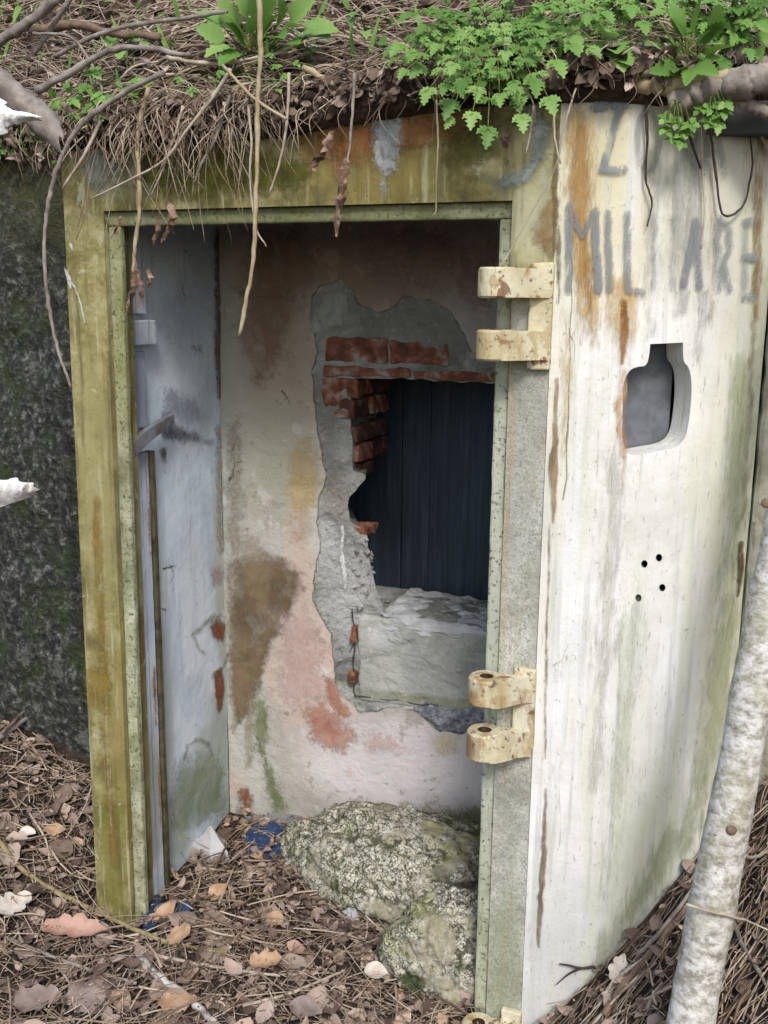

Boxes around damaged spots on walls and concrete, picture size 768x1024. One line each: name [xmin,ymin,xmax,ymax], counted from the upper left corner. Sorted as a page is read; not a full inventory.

rust [535,107,634,363]
flaking render [215,422,243,606]
flaking render [310,280,495,734]
water stain [223,537,303,762]